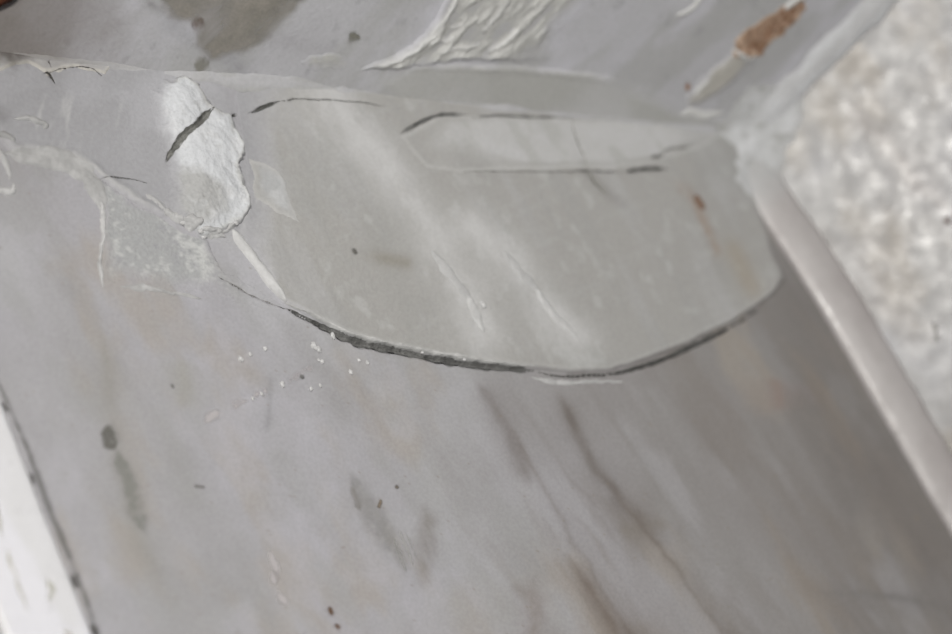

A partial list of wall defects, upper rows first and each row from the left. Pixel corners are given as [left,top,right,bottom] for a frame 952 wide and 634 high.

flaking render [359,0,592,71]
rust [731,0,806,61]
flaking render [146,76,299,240]
crack [166,98,385,161]
crack [401,112,690,194]
crack [219,277,757,378]